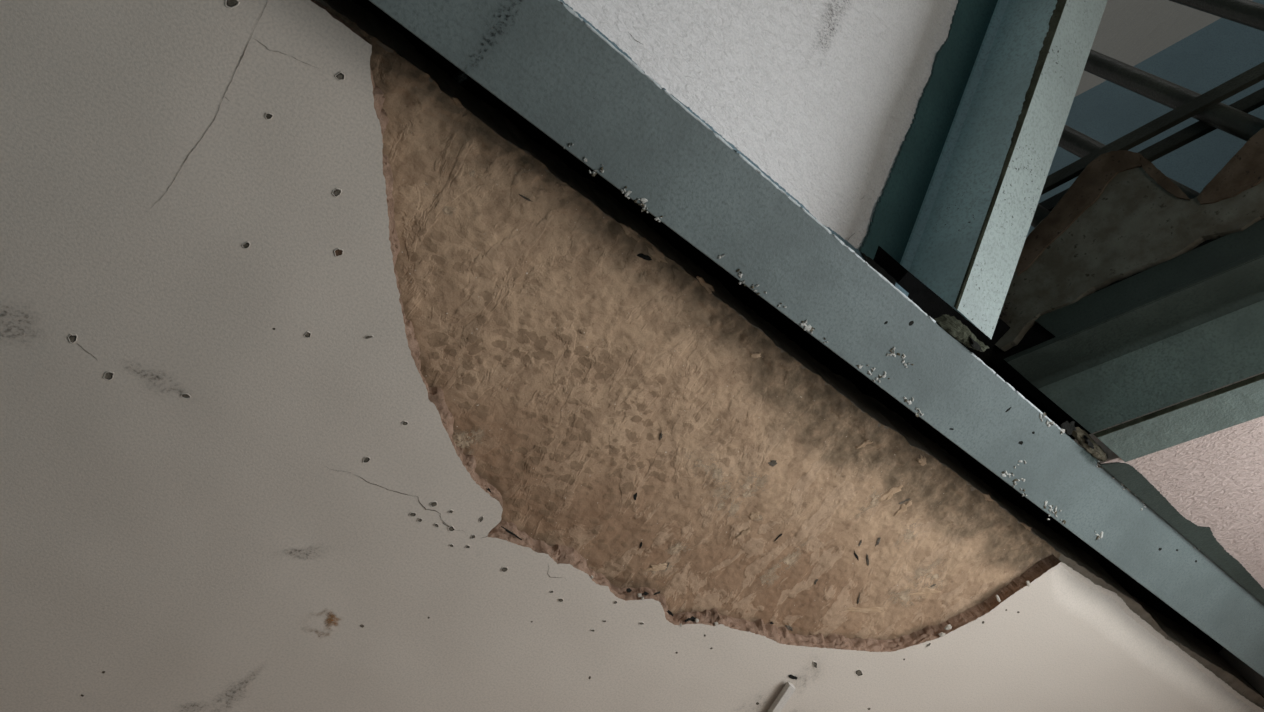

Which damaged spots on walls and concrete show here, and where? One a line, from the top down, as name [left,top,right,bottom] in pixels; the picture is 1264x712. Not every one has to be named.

crack [141,0,317,217]
flaking render [326,6,1061,668]